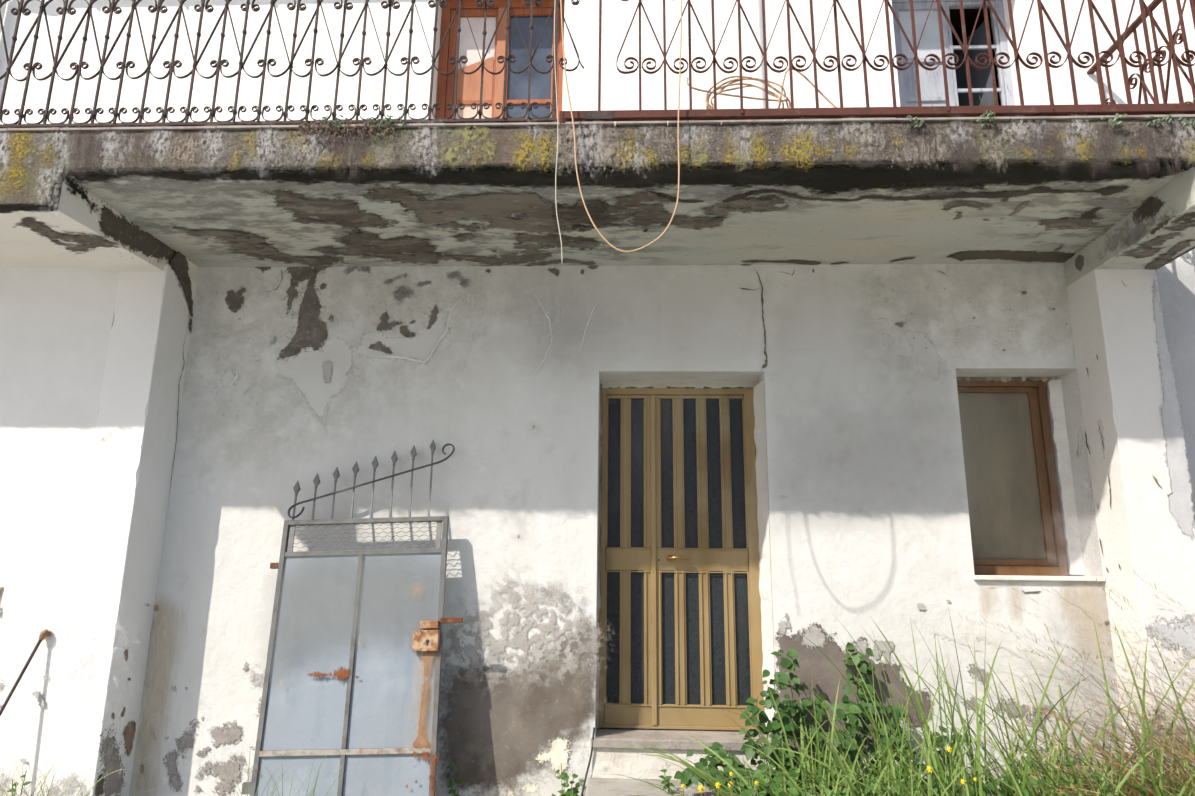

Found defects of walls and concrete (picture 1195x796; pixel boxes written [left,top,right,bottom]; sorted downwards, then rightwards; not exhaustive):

damp [39,122,1195,234]
peeling [1056,179,1108,191]
spalling [0,164,1038,436]
crack [741,265,768,368]
spalling [946,244,1084,272]
peeling [1026,196,1195,540]
peeling [1145,614,1195,659]
peeling [32,675,47,708]
damp [438,581,600,791]
peeling [95,707,136,796]
peeling [151,717,253,796]
peeling [1121,706,1193,769]